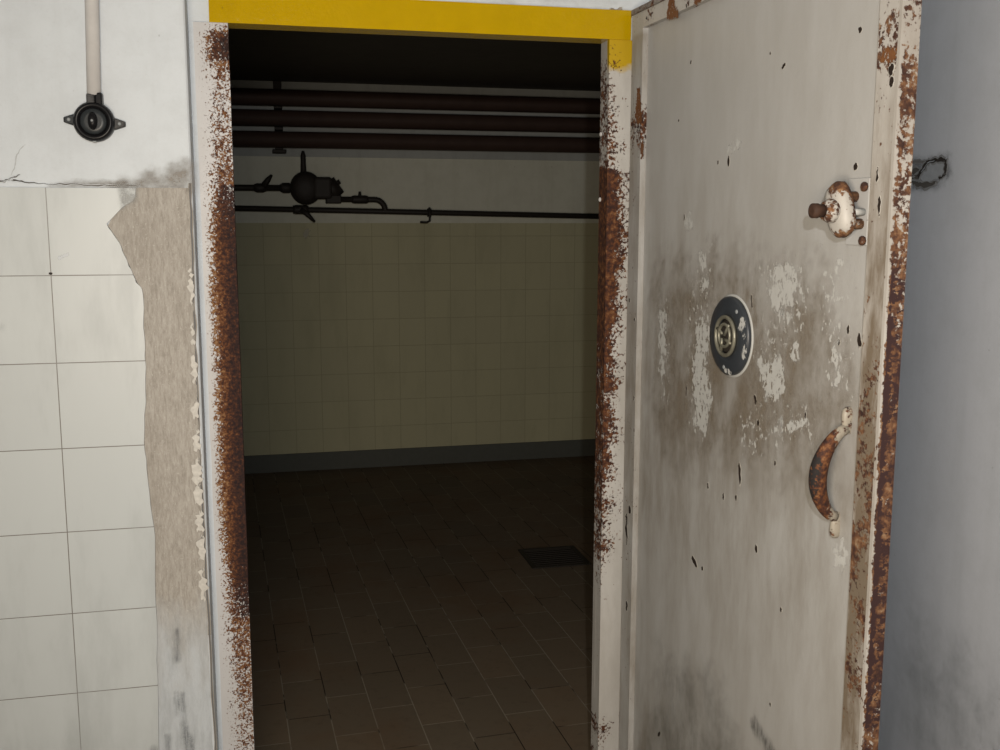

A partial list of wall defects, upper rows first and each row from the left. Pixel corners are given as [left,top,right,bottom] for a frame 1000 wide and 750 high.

flaking render [911,154,949,191]
flaking render [108,188,213,750]